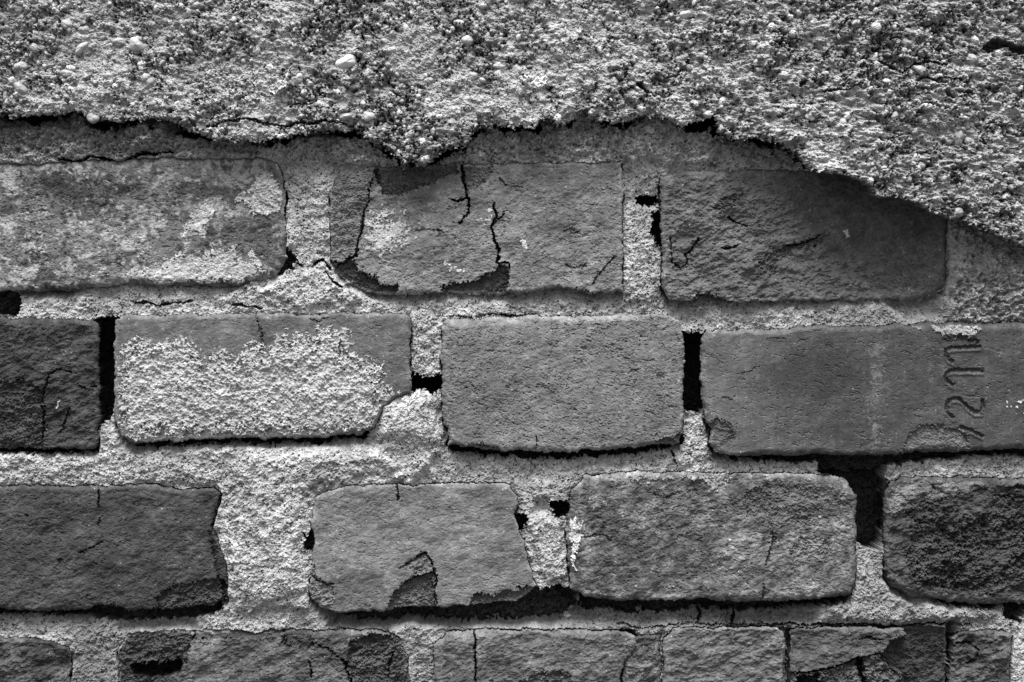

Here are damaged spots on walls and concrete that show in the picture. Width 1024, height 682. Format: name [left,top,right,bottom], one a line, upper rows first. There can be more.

peeling [130,199,272,284]
peeling [234,169,284,217]
spalling [331,165,494,292]
crack [415,167,510,265]
spalling [440,260,510,292]
peeling [116,325,401,442]
spalling [902,423,971,451]
peeling [569,516,585,571]
spalling [903,482,1024,599]
spalling [119,631,315,682]
spalling [343,632,407,682]
spalling [794,653,903,682]